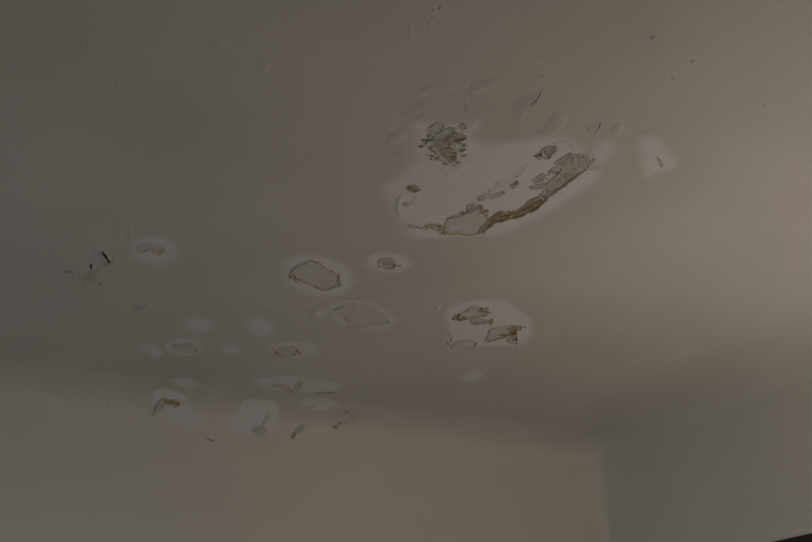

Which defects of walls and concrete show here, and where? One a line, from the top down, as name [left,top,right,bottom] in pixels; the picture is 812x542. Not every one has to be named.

flaking render [414,122,476,176]
peeling [395,141,595,237]
peeling [289,259,342,291]
peeling [445,305,526,351]